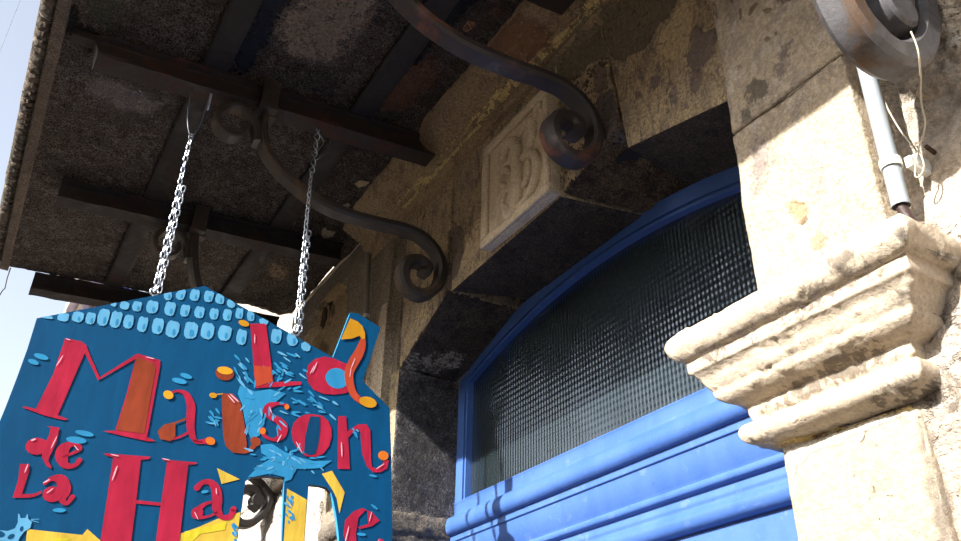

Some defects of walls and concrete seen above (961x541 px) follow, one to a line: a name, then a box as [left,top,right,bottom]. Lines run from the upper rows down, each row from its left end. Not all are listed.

peeling [771,406,916,474]